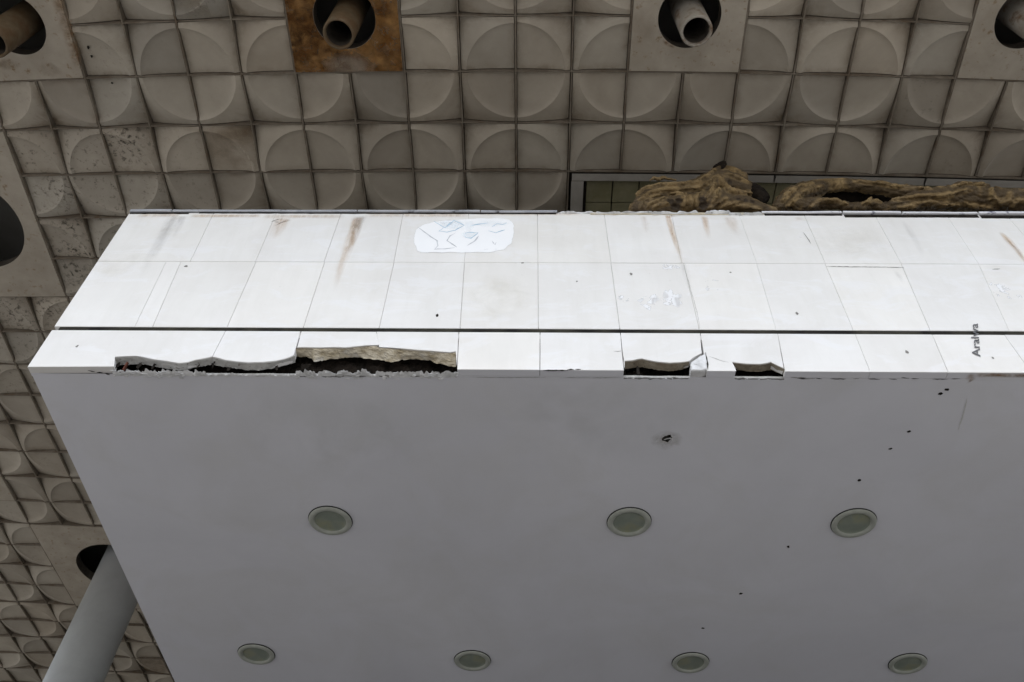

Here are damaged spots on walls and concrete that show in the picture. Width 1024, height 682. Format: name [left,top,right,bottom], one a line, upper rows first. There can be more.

corrosion [285,0,403,72]
spalling [110,346,459,380]
spalling [623,360,690,380]
spalling [733,363,784,380]